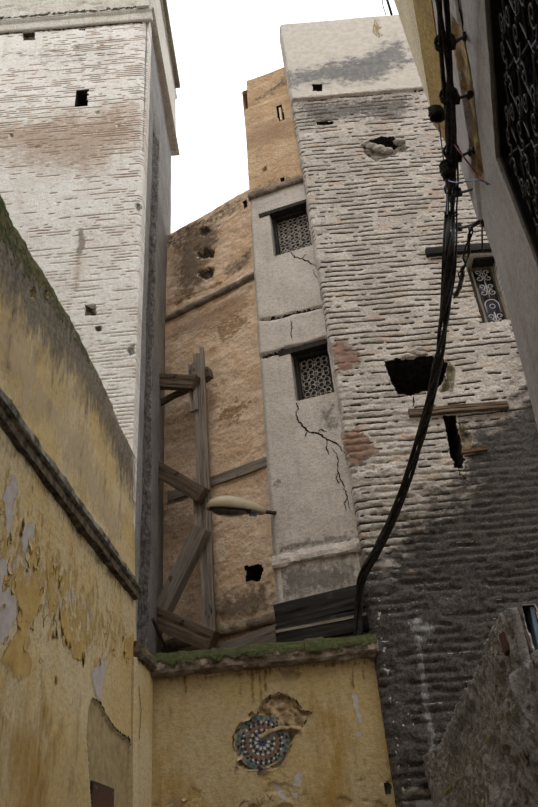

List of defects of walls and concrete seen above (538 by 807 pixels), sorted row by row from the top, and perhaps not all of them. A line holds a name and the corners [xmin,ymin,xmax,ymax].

leakage [256,41,412,101]
spalling [360,137,406,162]
leakage [0,226,136,541]
spalling [440,360,456,393]
flaking render [0,128,160,807]
crack [295,403,349,509]
spalling [232,692,312,775]
leakage [408,618,436,753]